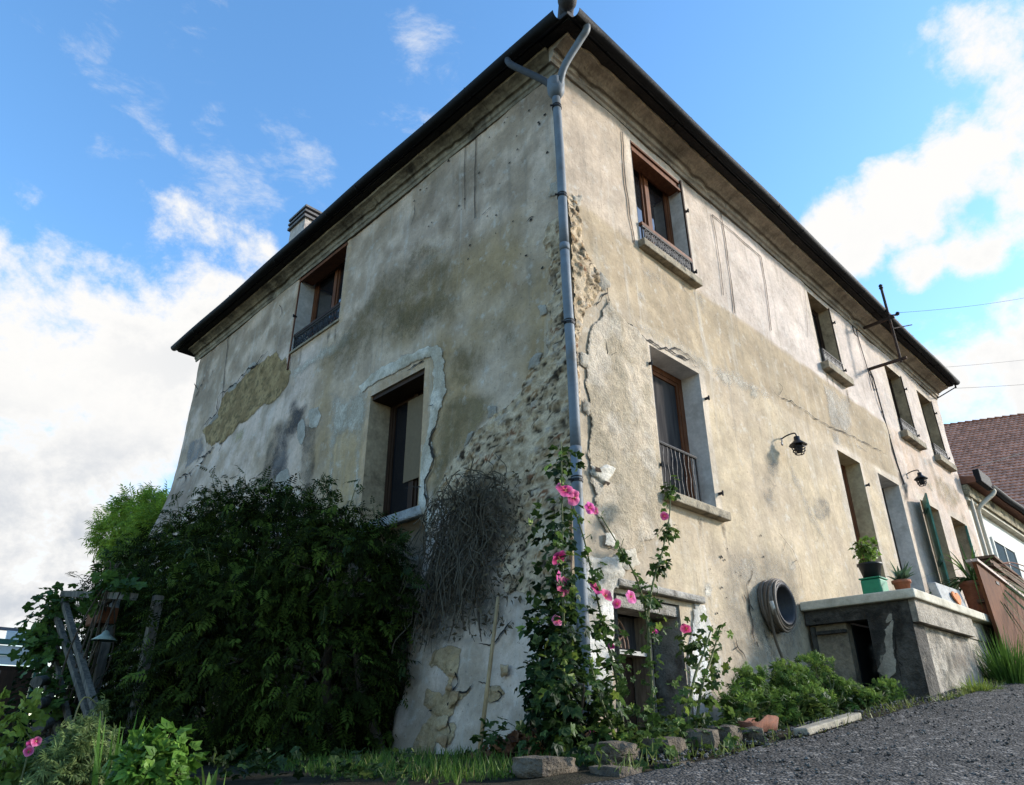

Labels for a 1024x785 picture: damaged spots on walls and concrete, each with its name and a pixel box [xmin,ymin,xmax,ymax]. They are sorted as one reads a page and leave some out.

crack [628,323,696,367]
peeling [202,352,291,446]
damp [264,403,315,499]
spalling [359,181,666,703]
spalling [413,645,469,754]